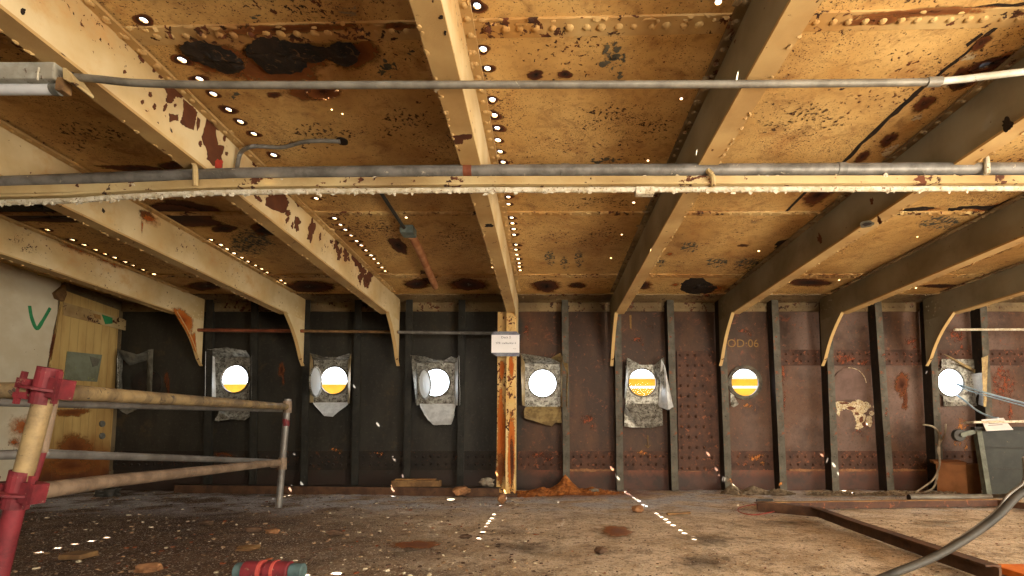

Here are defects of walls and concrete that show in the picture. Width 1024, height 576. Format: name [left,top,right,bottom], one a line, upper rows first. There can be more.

rust [384,22,415,31]
rust [170,23,381,137]
peeling [138,55,228,168]
peeling [435,189,635,208]
peeling [694,175,801,195]
peeling [0,178,413,288]
rust [448,278,489,291]
rust [531,279,586,293]
rust [673,278,724,294]
rust [895,372,909,410]
rust [496,356,515,490]
peeling [836,400,874,430]